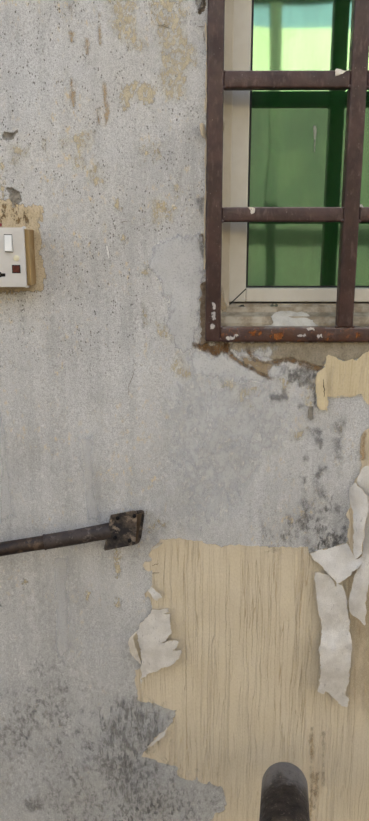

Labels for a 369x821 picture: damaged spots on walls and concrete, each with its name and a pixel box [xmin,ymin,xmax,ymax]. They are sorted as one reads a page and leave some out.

corrosion [192,342,230,356]
water stain [229,349,322,385]
water stain [303,517,341,549]
peeling [311,466,369,707]
peeling [128,587,182,688]